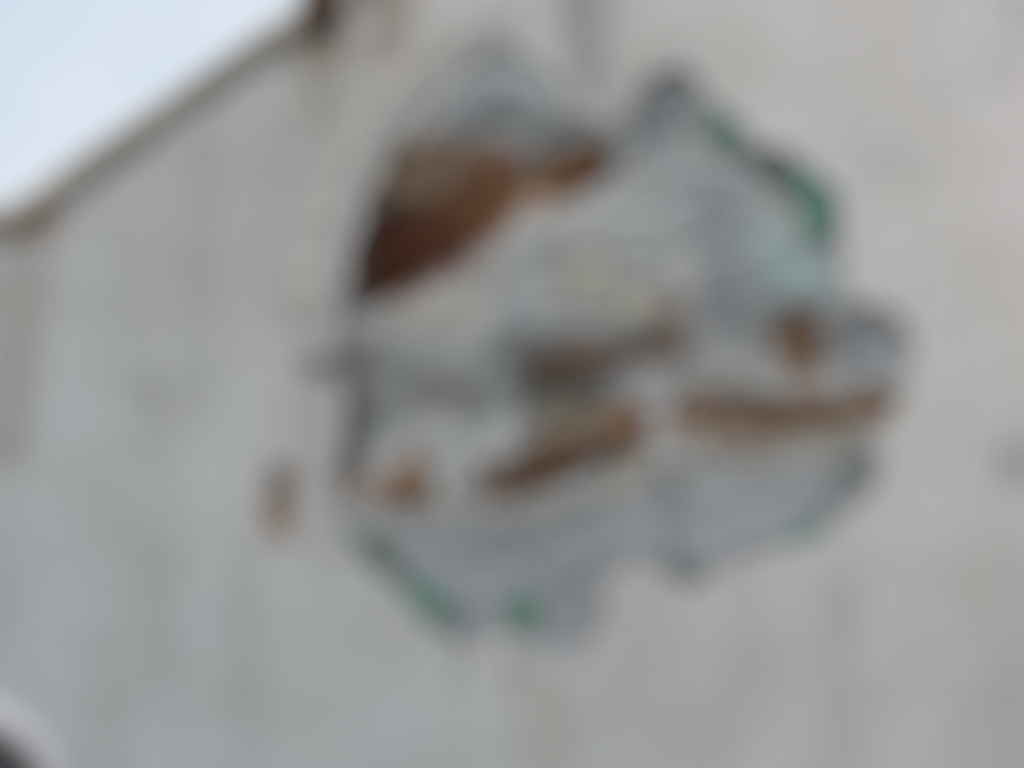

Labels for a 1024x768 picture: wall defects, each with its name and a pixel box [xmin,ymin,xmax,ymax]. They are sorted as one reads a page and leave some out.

rust [349,137,560,303]
spalling [334,42,917,678]